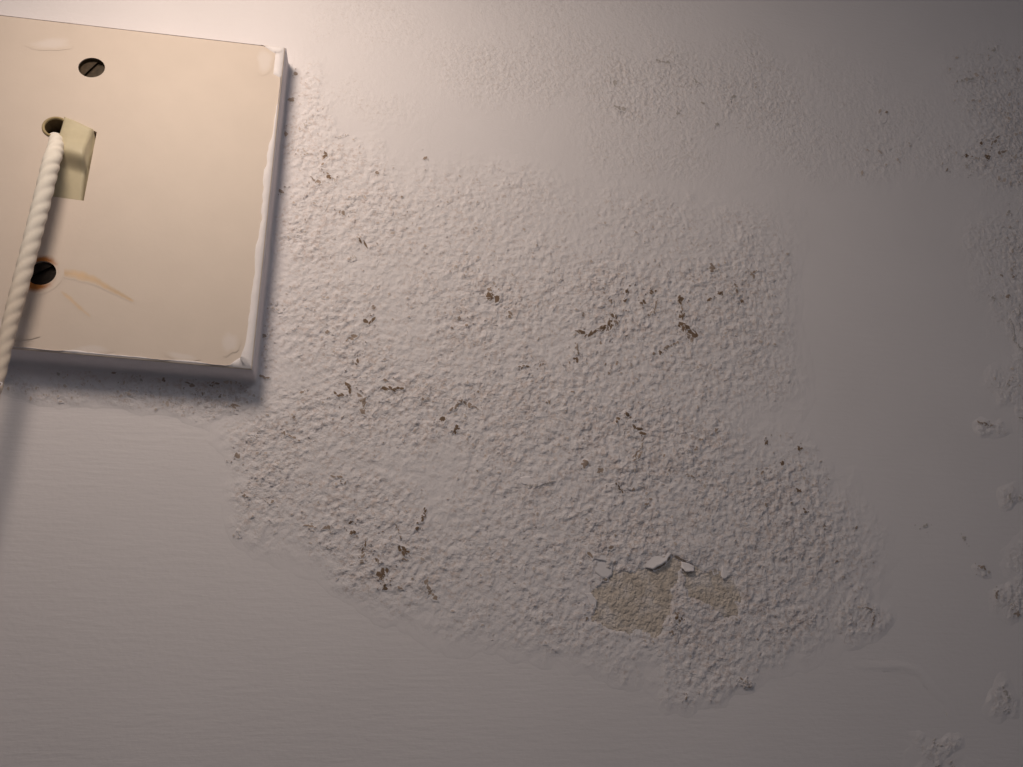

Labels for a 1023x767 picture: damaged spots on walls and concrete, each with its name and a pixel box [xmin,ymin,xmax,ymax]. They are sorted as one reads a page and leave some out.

peeling [584,544,741,638]